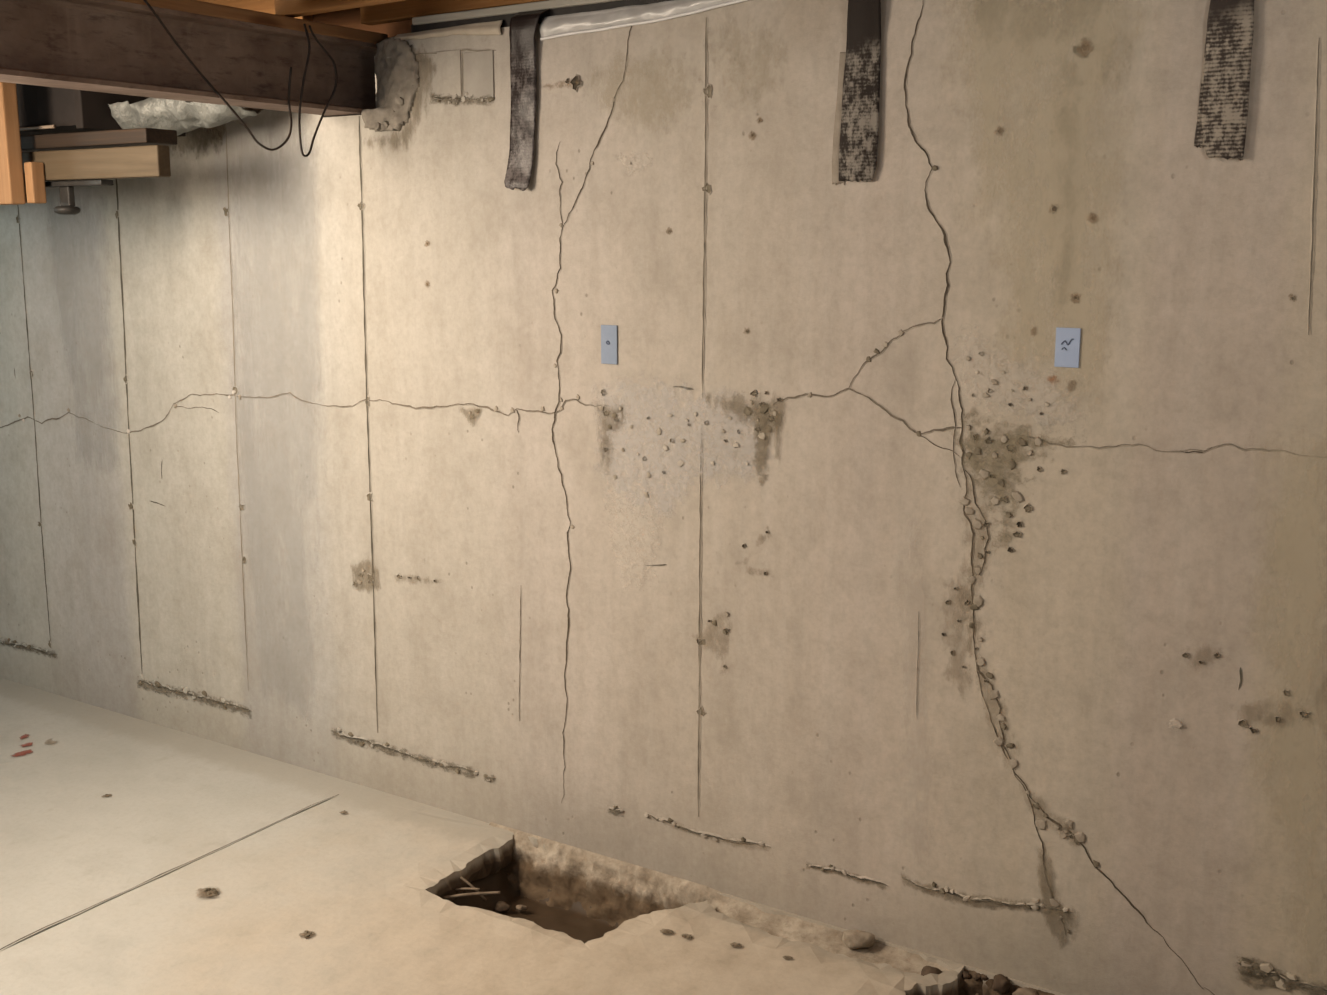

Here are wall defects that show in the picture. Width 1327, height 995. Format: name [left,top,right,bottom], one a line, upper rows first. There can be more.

crack [0,26,633,803]
spalling [353,562,378,589]
crack [773,0,1217,995]
crack [1020,434,1327,458]